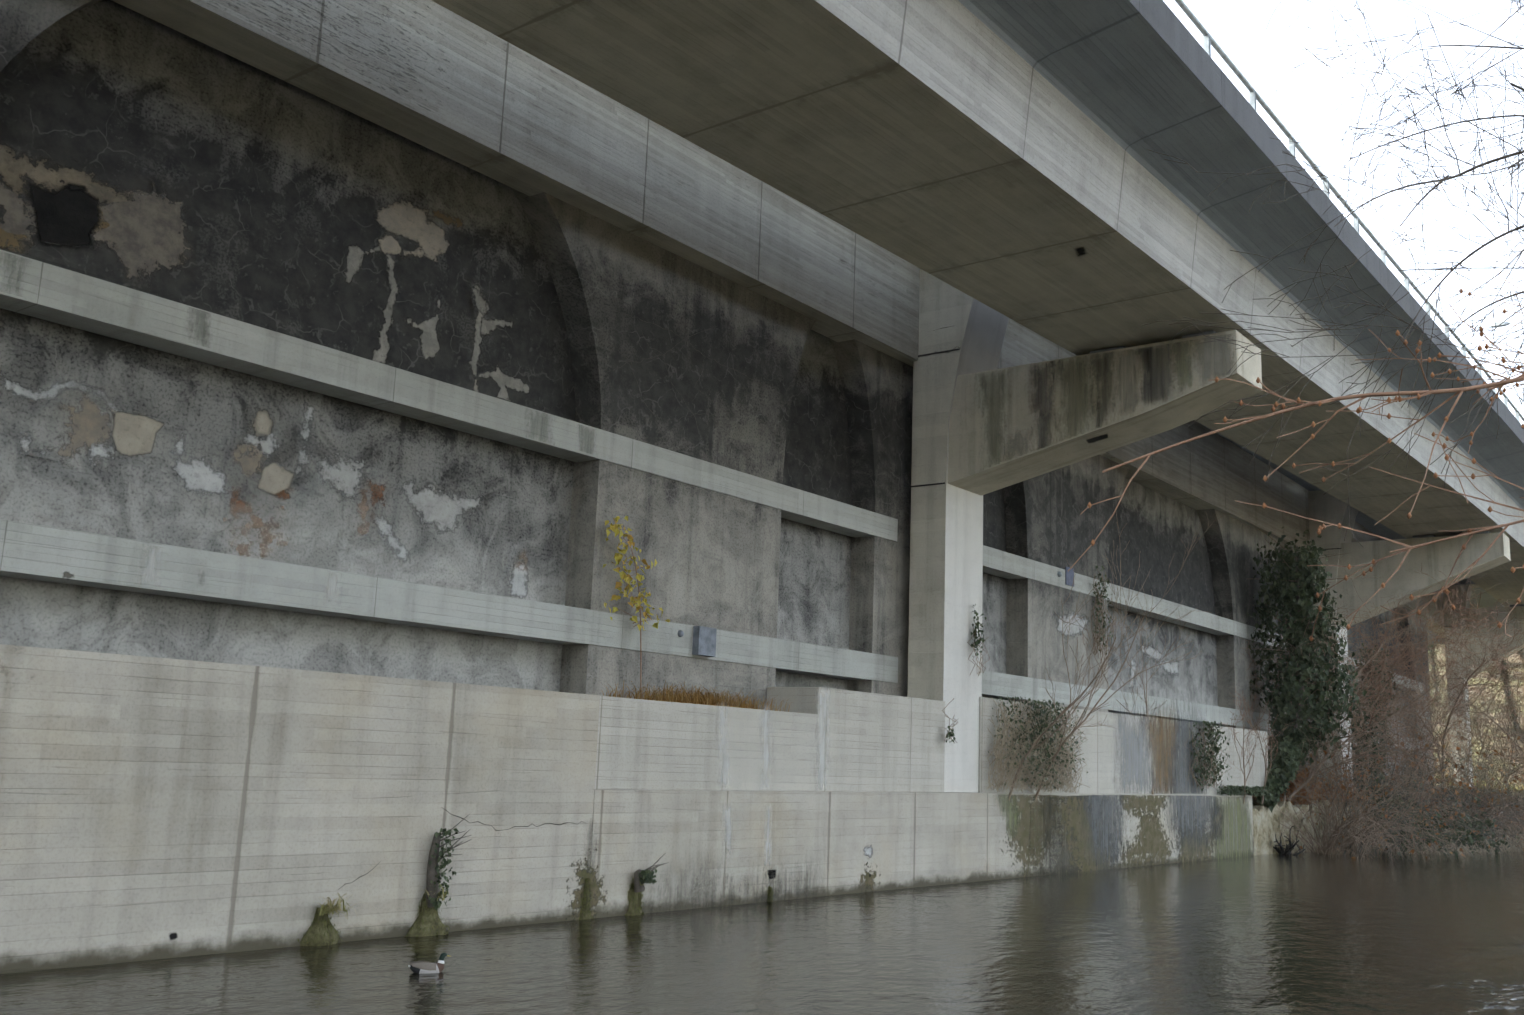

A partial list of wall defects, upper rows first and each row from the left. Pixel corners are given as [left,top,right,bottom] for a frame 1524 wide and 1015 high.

peeling [0,144,193,286]
peeling [344,198,463,364]
peeling [17,394,164,466]
peeling [172,410,294,507]
peeling [316,452,369,500]
peeling [396,480,482,534]
damp [991,361,1060,459]
damp [1067,335,1231,435]
crack [441,807,586,831]
damp [998,795,1124,877]
damp [1170,795,1251,863]